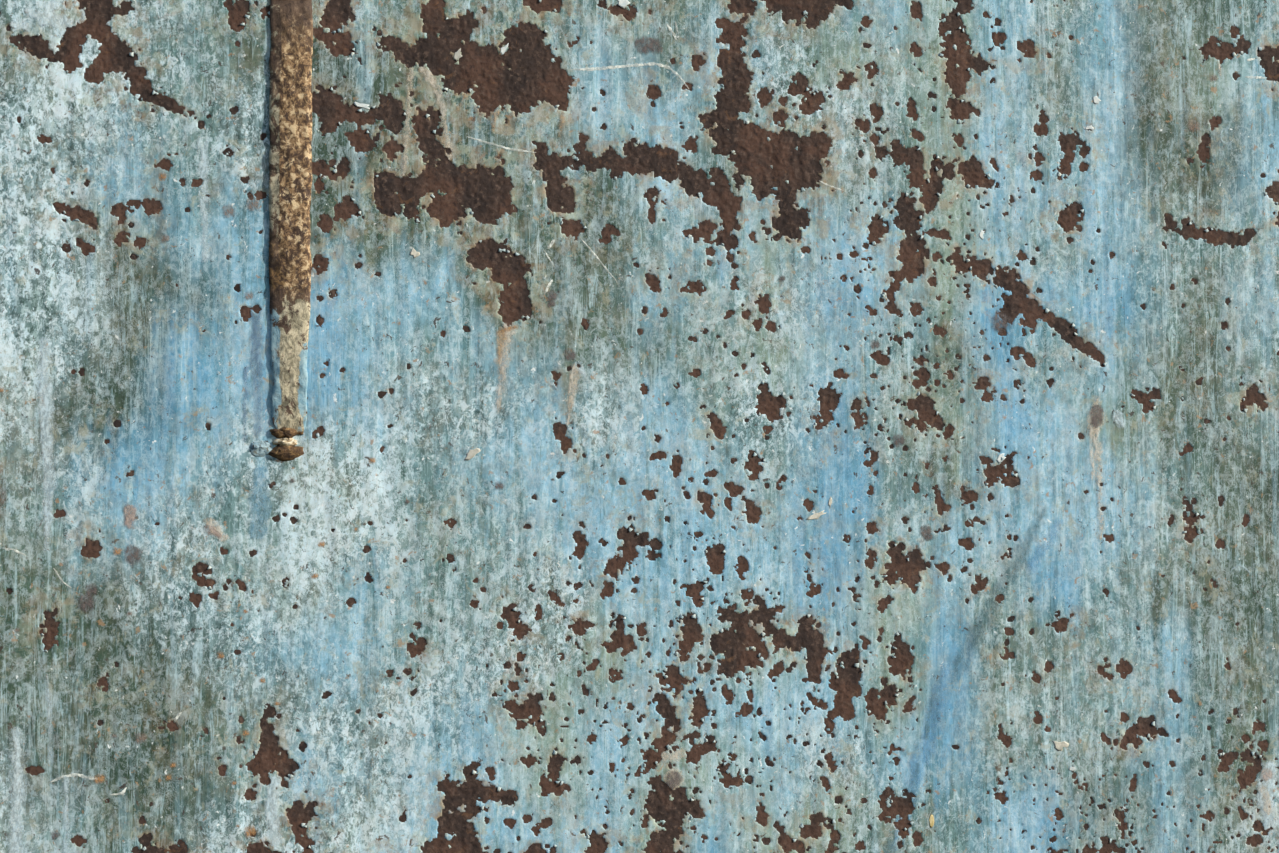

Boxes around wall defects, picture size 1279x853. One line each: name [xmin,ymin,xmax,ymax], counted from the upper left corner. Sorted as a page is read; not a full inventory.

corrosion [223,0,270,47]
corrosion [240,175,267,209]
corrosion [312,0,593,407]
corrosion [532,0,1106,505]
corrosion [234,284,262,324]
corrosion [272,504,299,524]
peeling [806,497,832,520]
corrosion [1029,610,1074,635]
corrosion [385,622,427,696]
corrosion [1025,660,1060,684]
corrosion [217,702,318,853]
corrosion [420,759,556,853]